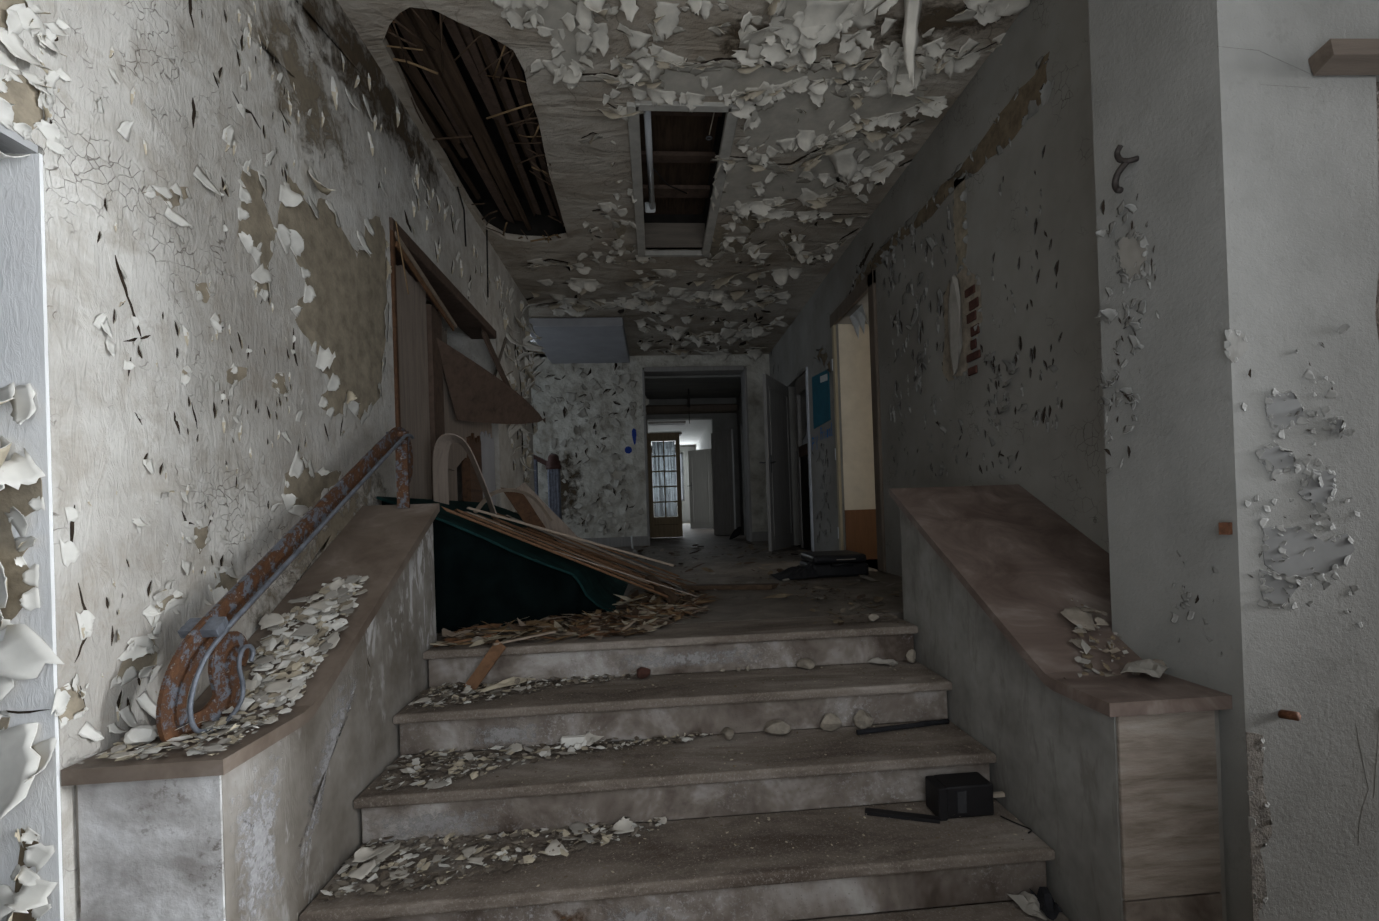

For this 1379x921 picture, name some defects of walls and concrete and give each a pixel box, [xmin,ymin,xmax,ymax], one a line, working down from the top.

peeling [0,0,400,820]
peeling [393,0,1030,543]
spalling [855,52,1063,479]
spalling [1224,329,1251,378]
peeling [1244,349,1363,629]
peeling [0,826,57,921]